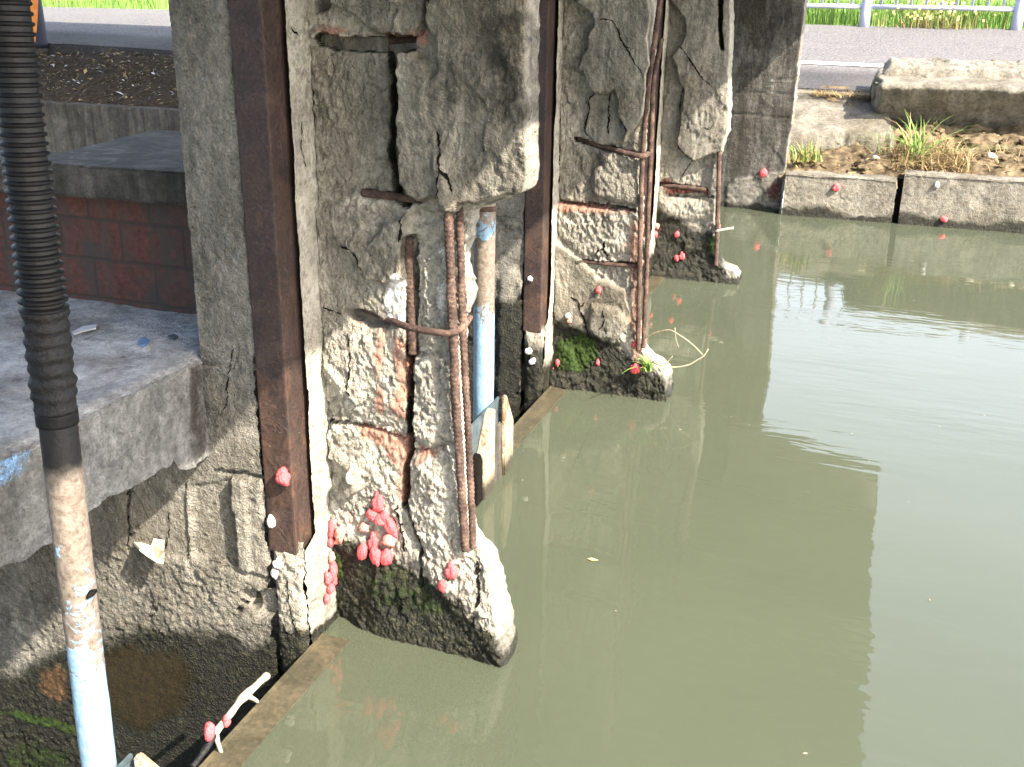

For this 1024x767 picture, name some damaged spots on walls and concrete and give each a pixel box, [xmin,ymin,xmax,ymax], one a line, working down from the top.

crack [600,18,644,78]
crack [679,46,710,113]
crack [584,93,627,136]
crack [436,131,452,199]
corrosion [558,201,607,213]
spalling [556,0,722,351]
corrosion [662,178,709,195]
spalling [310,41,488,567]
corrosion [621,210,644,358]
crack [286,579,297,634]
water stain [104,645,191,731]